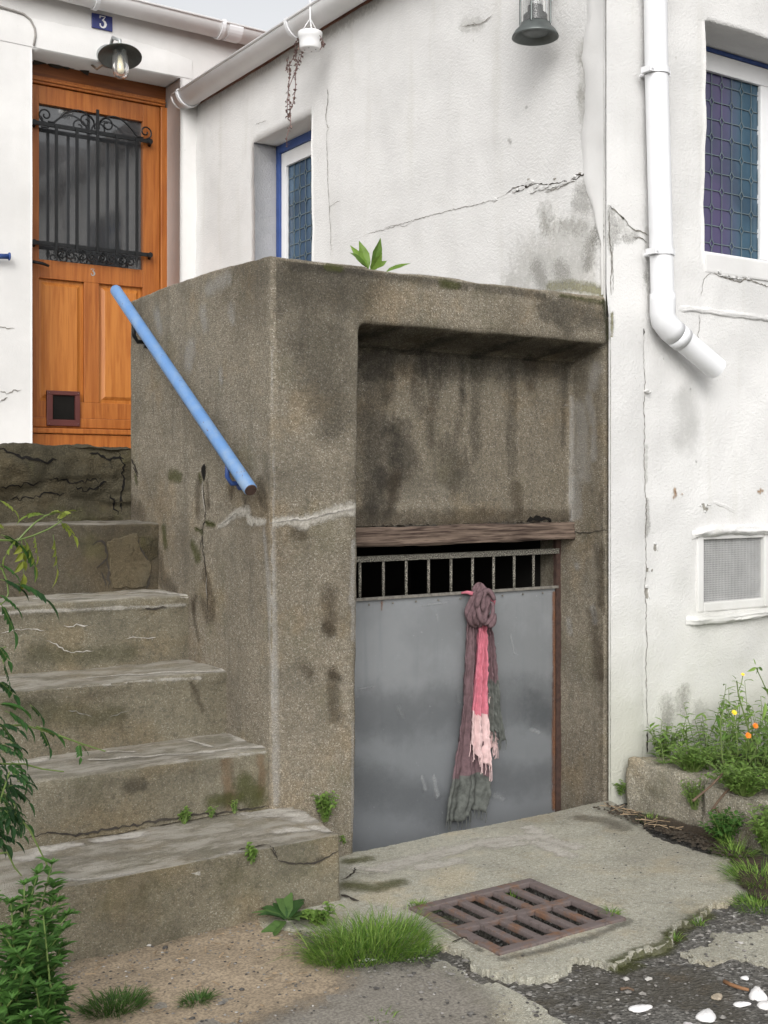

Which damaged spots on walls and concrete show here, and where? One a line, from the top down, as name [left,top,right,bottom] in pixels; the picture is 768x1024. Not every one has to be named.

crack [369,172,584,234]
crack [603,198,647,285]
crack [701,270,768,293]
crack [0,448,138,513]
crack [191,482,214,609]
crack [18,806,269,839]
crack [239,844,338,865]